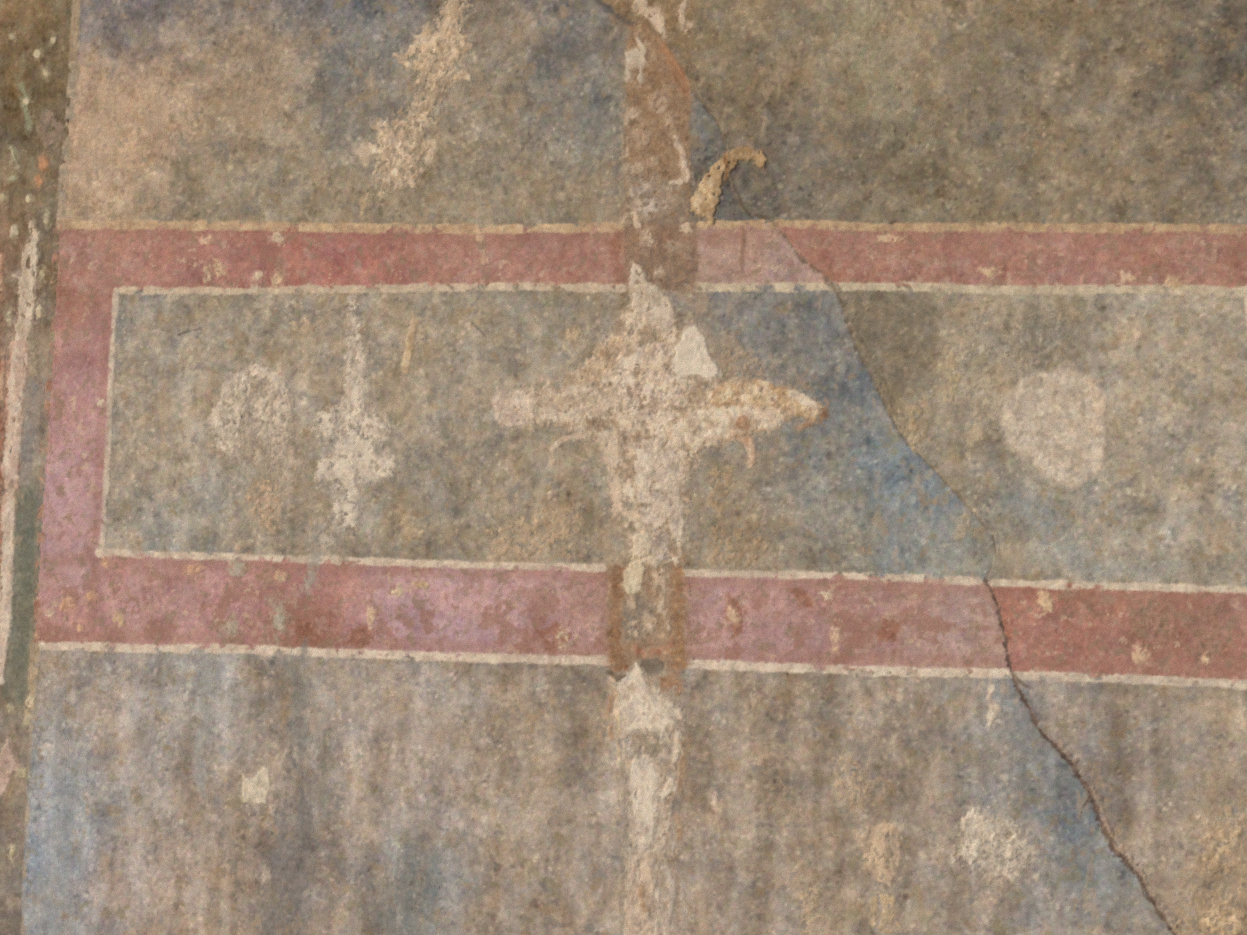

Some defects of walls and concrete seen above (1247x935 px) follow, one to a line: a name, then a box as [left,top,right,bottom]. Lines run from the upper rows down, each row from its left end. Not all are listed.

flaking render [236,746,296,824]
crack [591,0,631,25]
flaking render [478,0,836,601]
crack [696,92,1181,935]